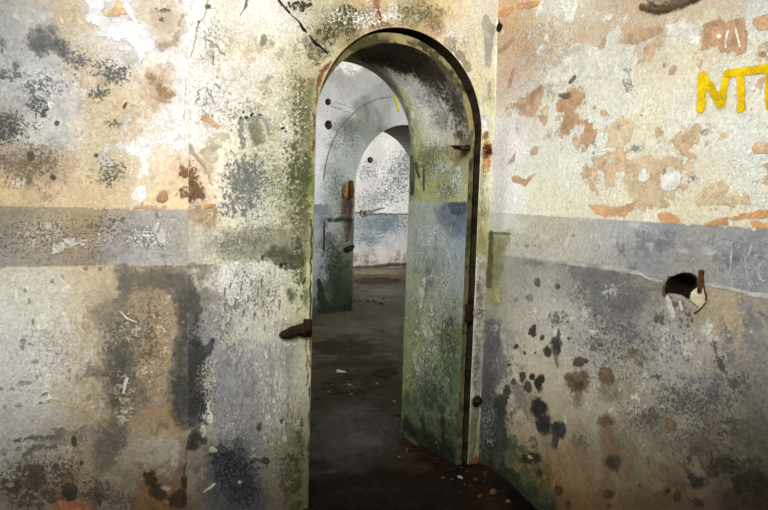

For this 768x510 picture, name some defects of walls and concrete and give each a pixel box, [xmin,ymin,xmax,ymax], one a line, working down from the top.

crack [278,0,328,54]
peeling [334,0,420,29]
water stain [0,24,137,192]
water stain [0,109,475,510]
rust [341,190,354,242]
rust [483,131,492,174]
peeling [444,0,768,211]
spalling [510,205,768,338]
peeling [695,180,750,217]
water stain [479,265,768,510]